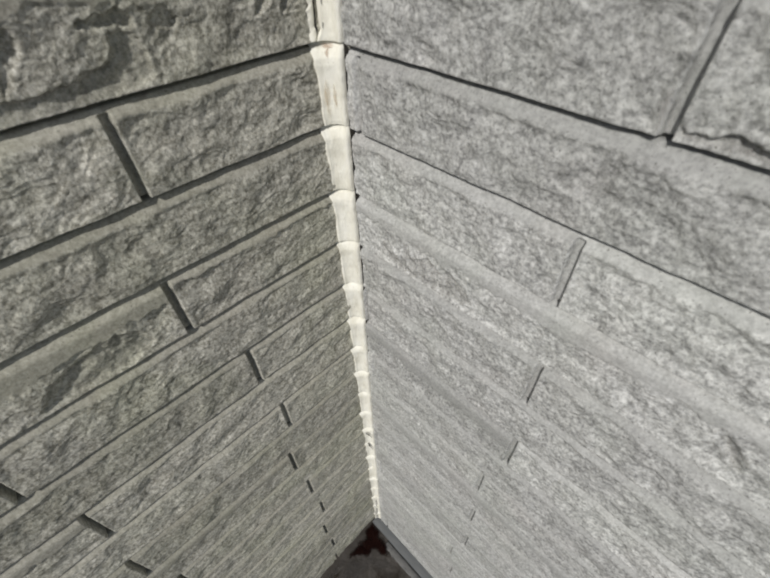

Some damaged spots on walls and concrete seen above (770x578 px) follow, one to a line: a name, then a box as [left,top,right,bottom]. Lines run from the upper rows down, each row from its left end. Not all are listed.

rust [350,524,388,558]